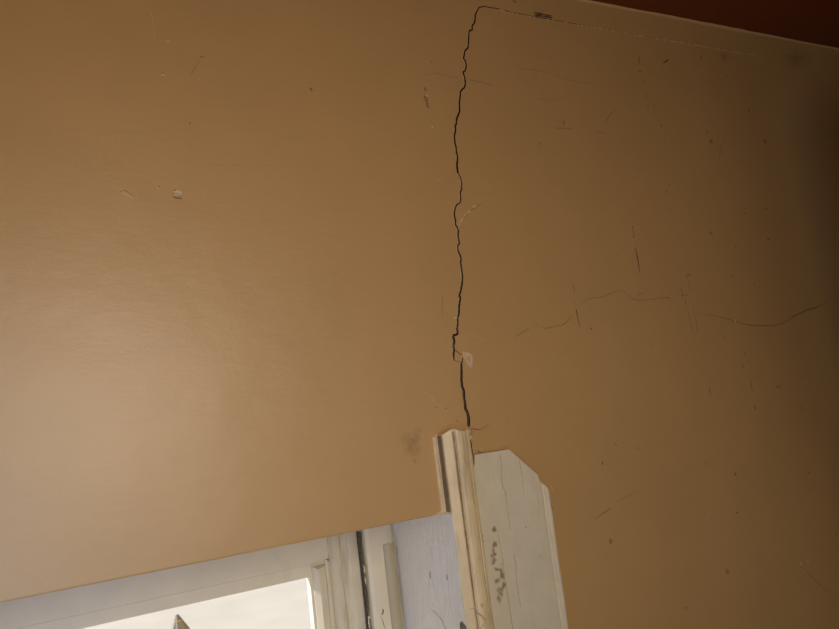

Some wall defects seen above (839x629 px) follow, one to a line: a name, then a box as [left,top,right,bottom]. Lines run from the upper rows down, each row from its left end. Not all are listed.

crack [452,6,762,430]